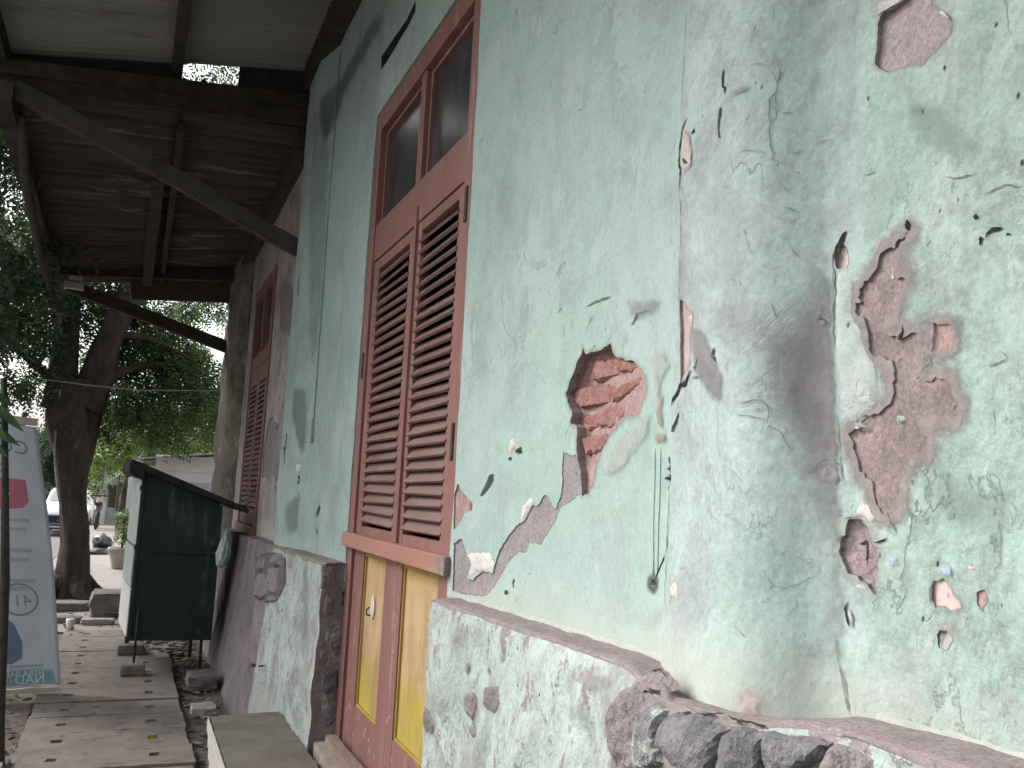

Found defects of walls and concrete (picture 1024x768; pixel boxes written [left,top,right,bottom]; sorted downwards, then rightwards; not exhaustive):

flaking render [874,0,953,72]
water stain [681,130,691,170]
flaking render [679,300,698,388]
water stain [690,330,721,398]
flaking render [836,219,970,595]
flaking render [447,343,874,768]
peeling [929,578,962,650]
peeling [976,590,987,612]